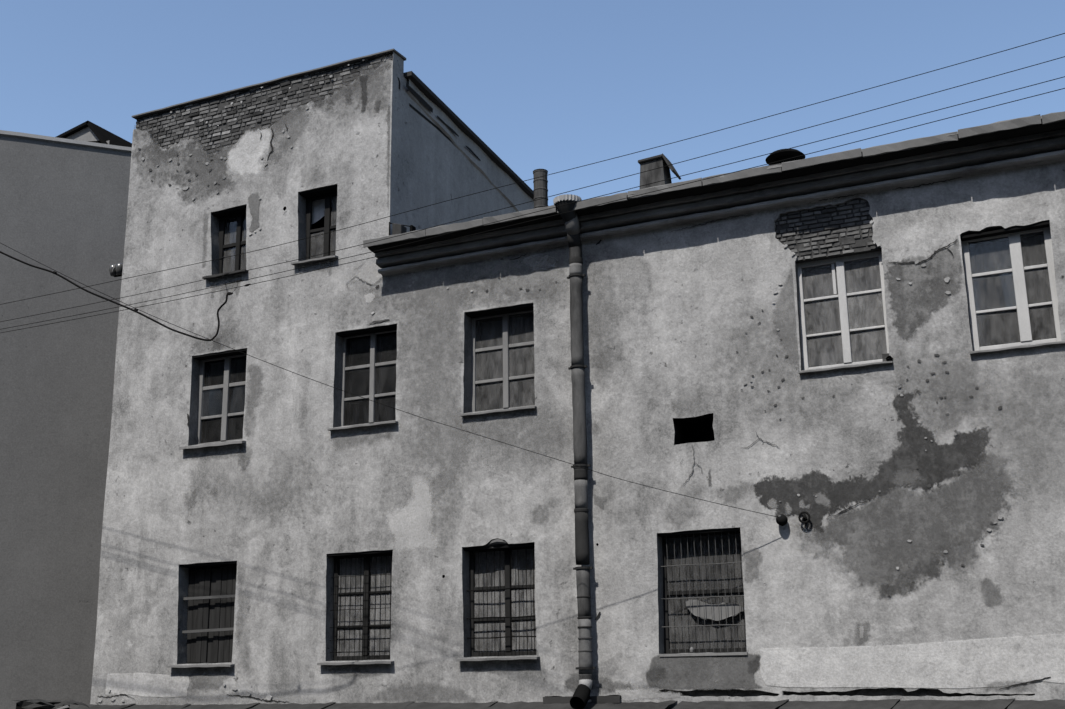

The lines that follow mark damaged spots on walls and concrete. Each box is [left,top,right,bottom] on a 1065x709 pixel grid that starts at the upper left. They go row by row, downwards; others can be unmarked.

flaking render [135,53,393,201]
flaking render [775,198,881,262]
crack [888,239,957,264]
flaking render [884,250,962,340]
flaking render [609,654,1035,701]